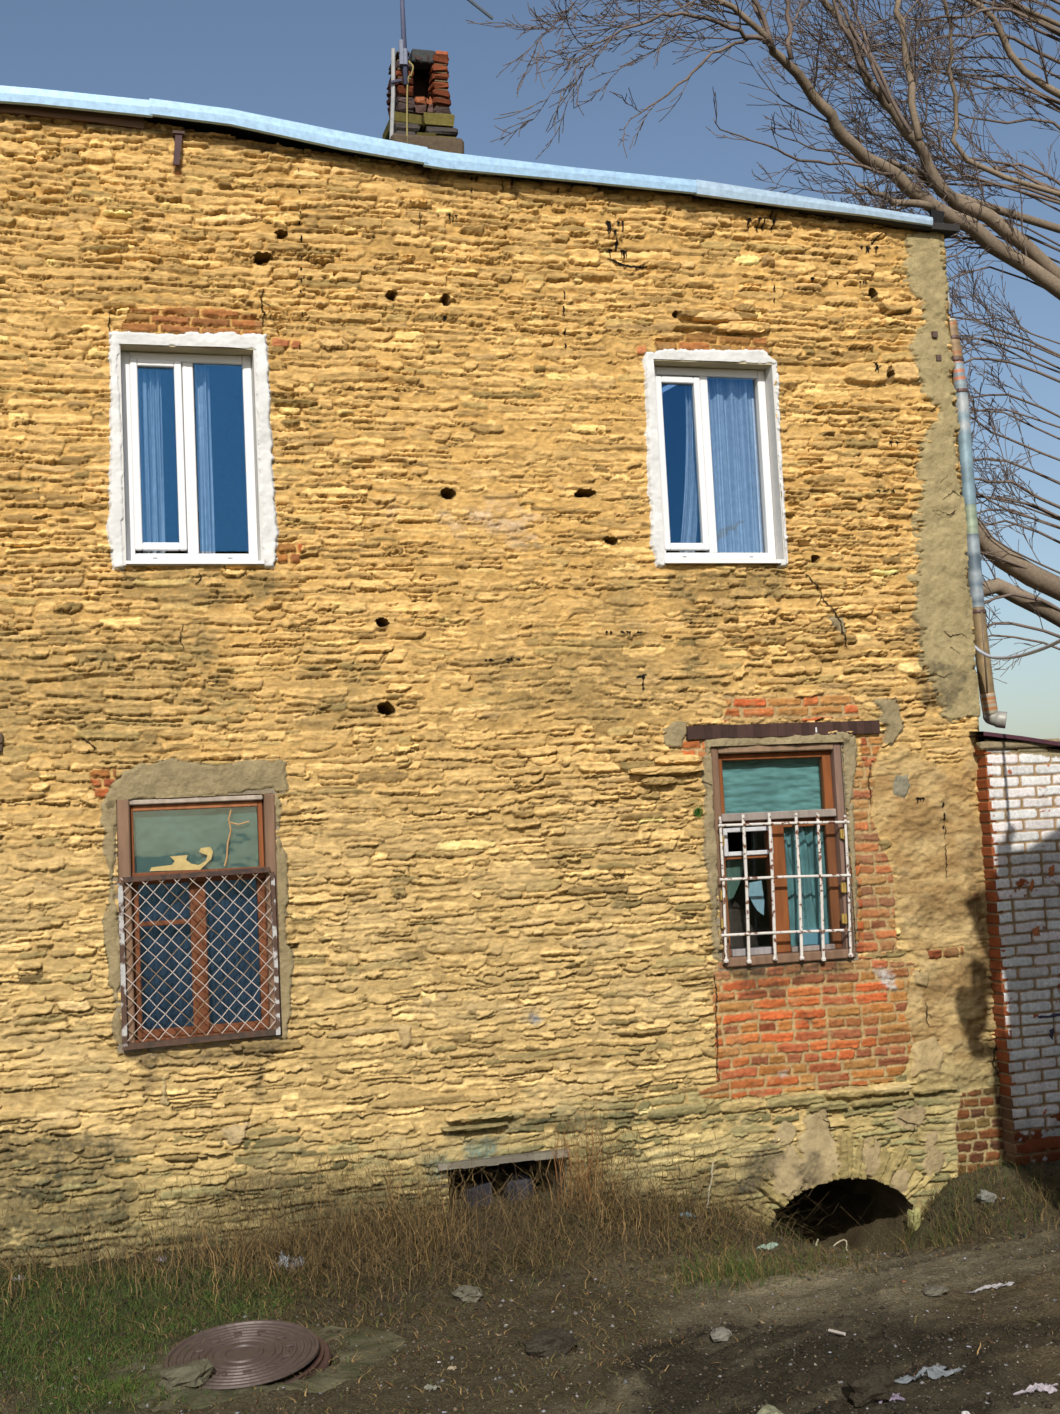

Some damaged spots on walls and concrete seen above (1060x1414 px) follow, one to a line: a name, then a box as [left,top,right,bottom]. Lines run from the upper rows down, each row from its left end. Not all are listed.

crack [805,574,847,646]
peeling [842,734,859,948]
flaking render [910,1036,945,1078]
flaking render [767,1107,842,1200]
flaking render [862,1102,946,1194]
peeling [1025,1113,1060,1150]